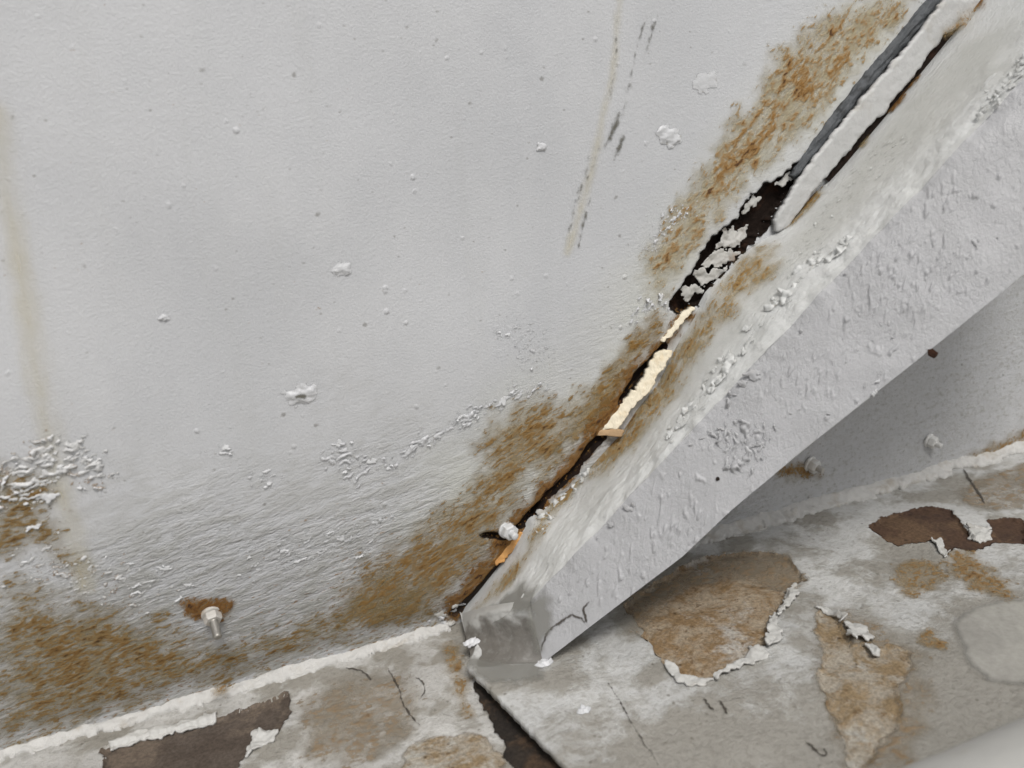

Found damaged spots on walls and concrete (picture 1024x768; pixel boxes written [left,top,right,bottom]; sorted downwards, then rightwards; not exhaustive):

corrosion [646,0,909,291]
crack [824,29,957,182]
crack [669,163,796,314]
crack [618,342,668,405]
corrosion [0,244,780,747]
crack [449,436,607,617]
peeling [869,506,1024,558]
peeling [99,691,292,768]
crack [541,603,587,650]
peeling [623,551,807,687]
peeling [813,606,915,768]